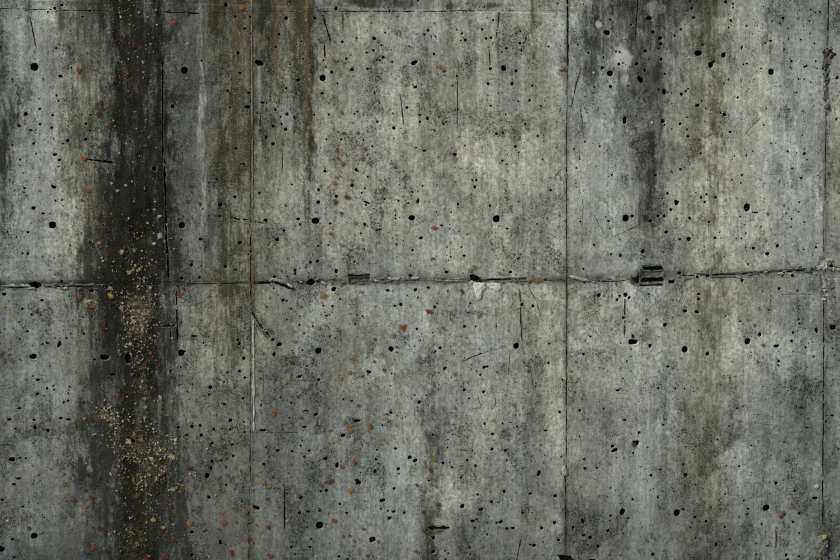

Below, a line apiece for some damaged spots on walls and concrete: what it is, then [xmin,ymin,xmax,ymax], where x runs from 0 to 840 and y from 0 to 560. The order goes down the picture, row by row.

rust [197,88,208,153]
rust [208,0,318,225]
damp [583,0,677,84]
damp [631,104,666,232]
damp [56,0,196,560]
rust [216,207,254,369]